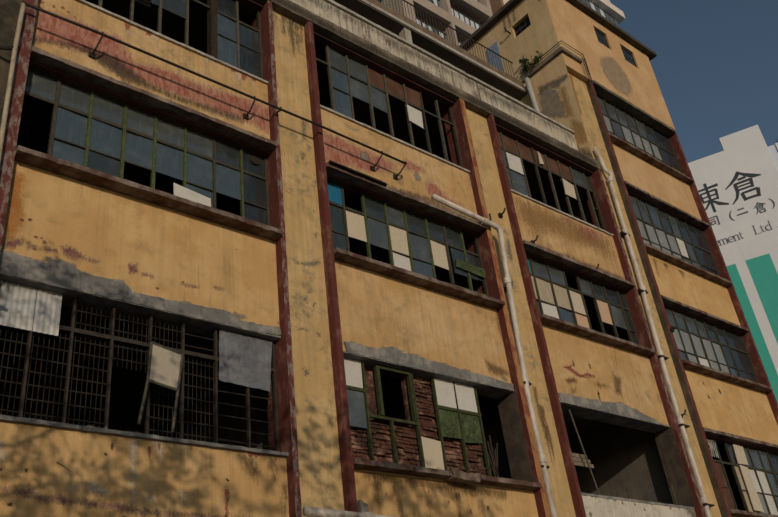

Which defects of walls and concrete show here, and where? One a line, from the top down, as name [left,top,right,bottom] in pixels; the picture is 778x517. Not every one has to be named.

peeling [3,236,99,263]
peeling [127,263,153,278]